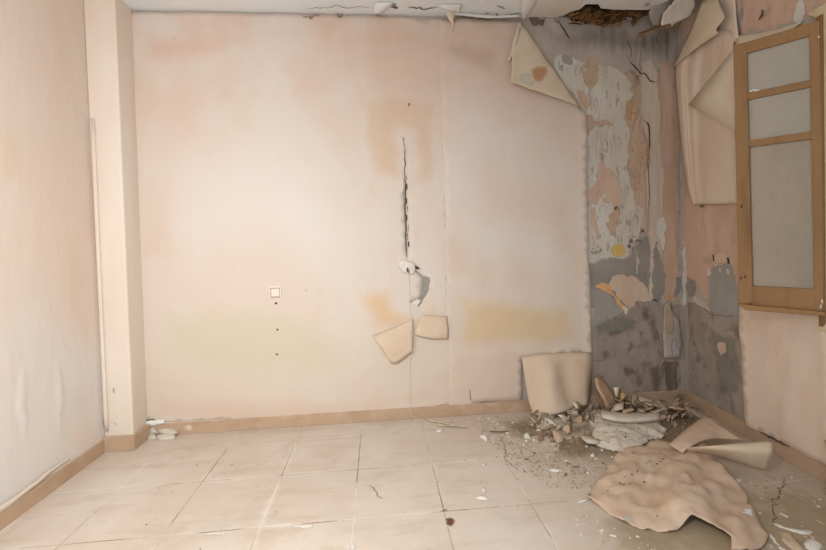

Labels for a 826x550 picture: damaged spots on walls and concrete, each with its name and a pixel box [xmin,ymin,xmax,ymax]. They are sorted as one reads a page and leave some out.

crack [455,6,521,20]
spalling [521,0,661,39]
water stain [353,87,444,192]
crack [402,139,410,253]
peeling [554,54,650,263]
water stain [141,110,745,421]
peeling [595,274,653,314]
crack [771,480,787,527]